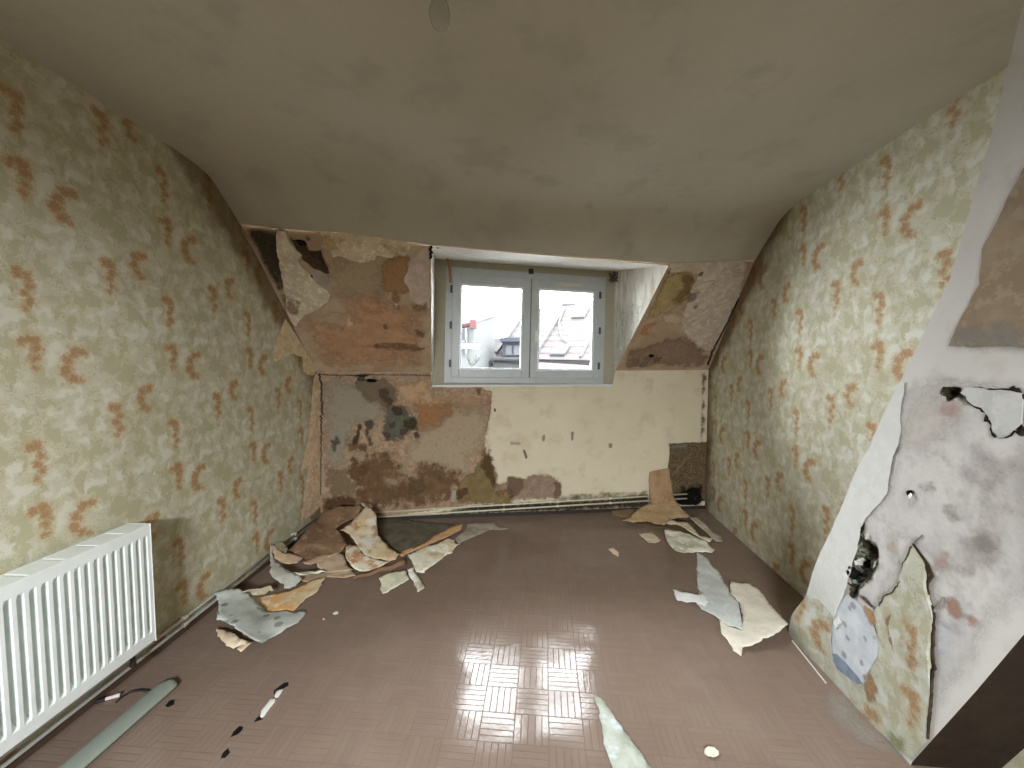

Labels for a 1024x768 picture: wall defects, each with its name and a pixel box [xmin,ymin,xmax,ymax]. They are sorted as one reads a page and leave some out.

peeling [320,232,430,311]
peeling [663,260,747,351]
peeling [949,168,1024,348]
peeling [274,319,492,520]
peeling [940,386,1024,438]
peeling [668,442,707,501]
peeling [806,382,905,628]